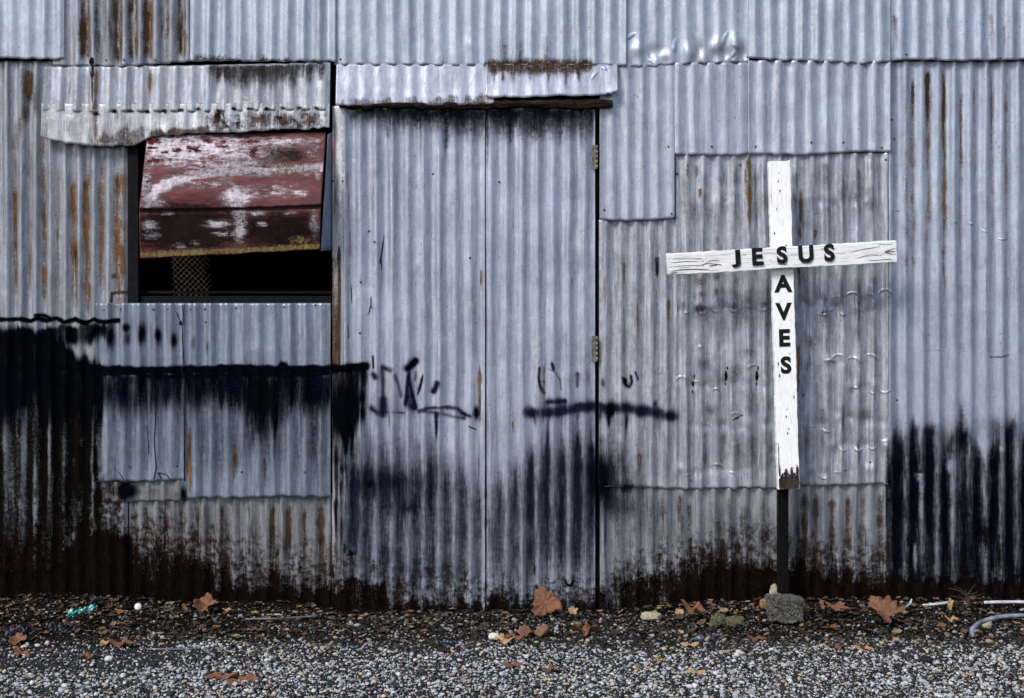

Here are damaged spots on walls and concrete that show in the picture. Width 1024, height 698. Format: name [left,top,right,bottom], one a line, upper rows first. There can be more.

corrosion [79,0,326,144]
corrosion [488,55,592,83]
corrosion [29,166,58,298]
corrosion [71,168,128,311]
corrosion [140,200,320,258]
peeling [142,135,323,241]
corrosion [265,148,306,173]
corrosion [910,71,946,288]
corrosion [0,475,1024,612]